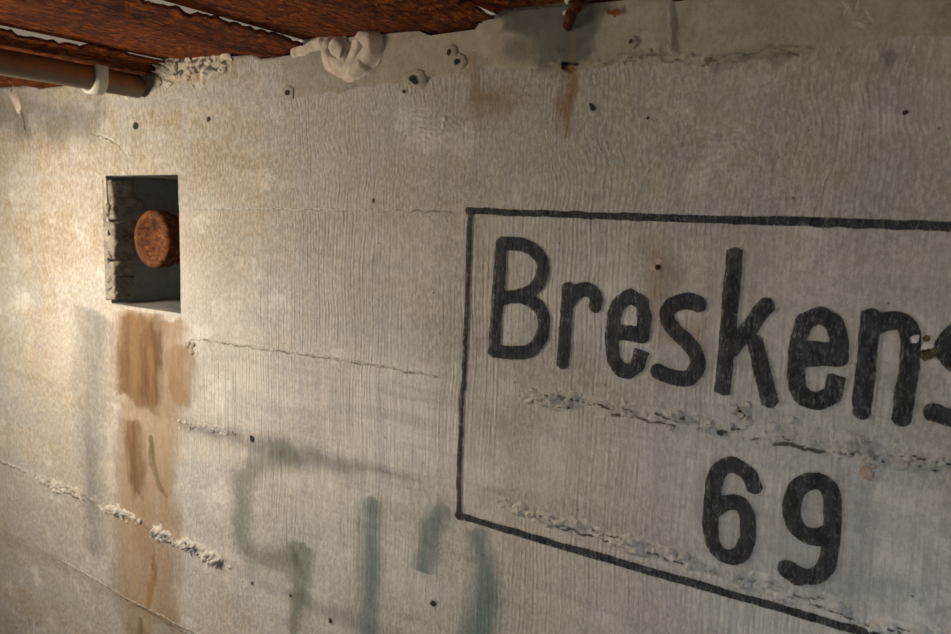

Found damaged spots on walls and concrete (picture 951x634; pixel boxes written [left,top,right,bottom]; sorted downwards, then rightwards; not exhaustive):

damp [500,3,594,63]
peeling [221,54,233,74]